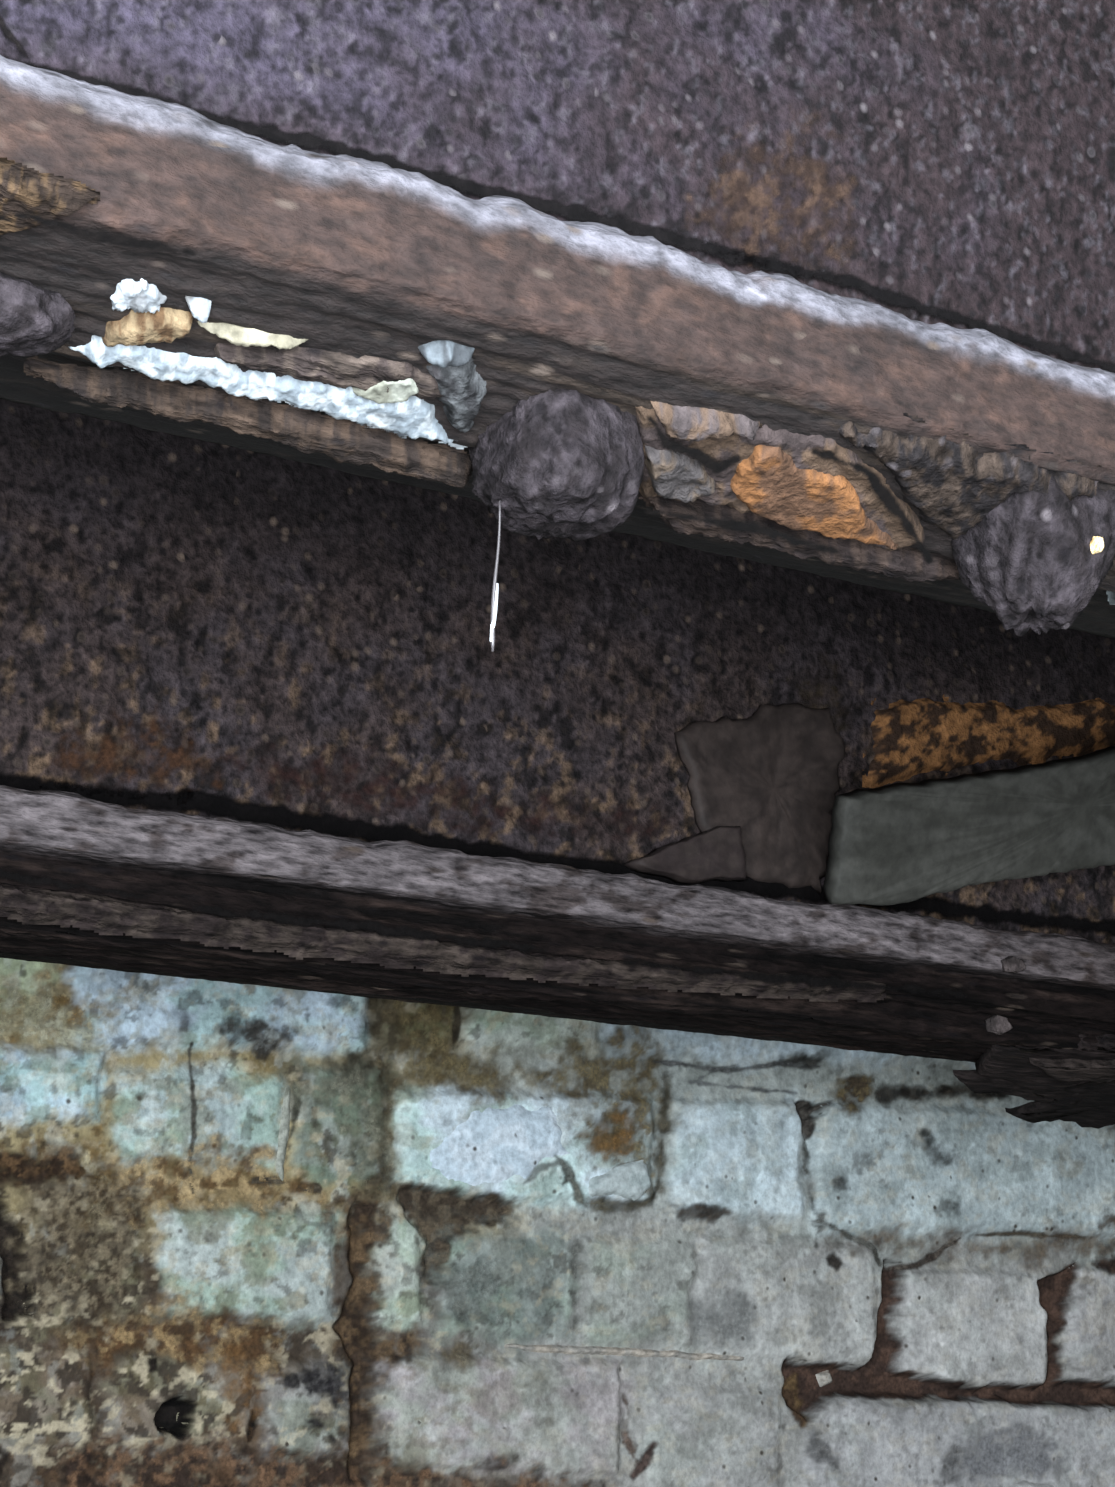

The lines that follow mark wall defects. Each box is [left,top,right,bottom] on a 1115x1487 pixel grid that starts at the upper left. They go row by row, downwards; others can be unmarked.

leakage [219,1017,290,1057]
leakage [275,998,394,1181]
peeling [953,1033,1115,1129]
crack [526,1158,584,1204]
leakage [0,1140,144,1328]
leakage [445,1242,752,1361]
leakage [284,1363,347,1409]